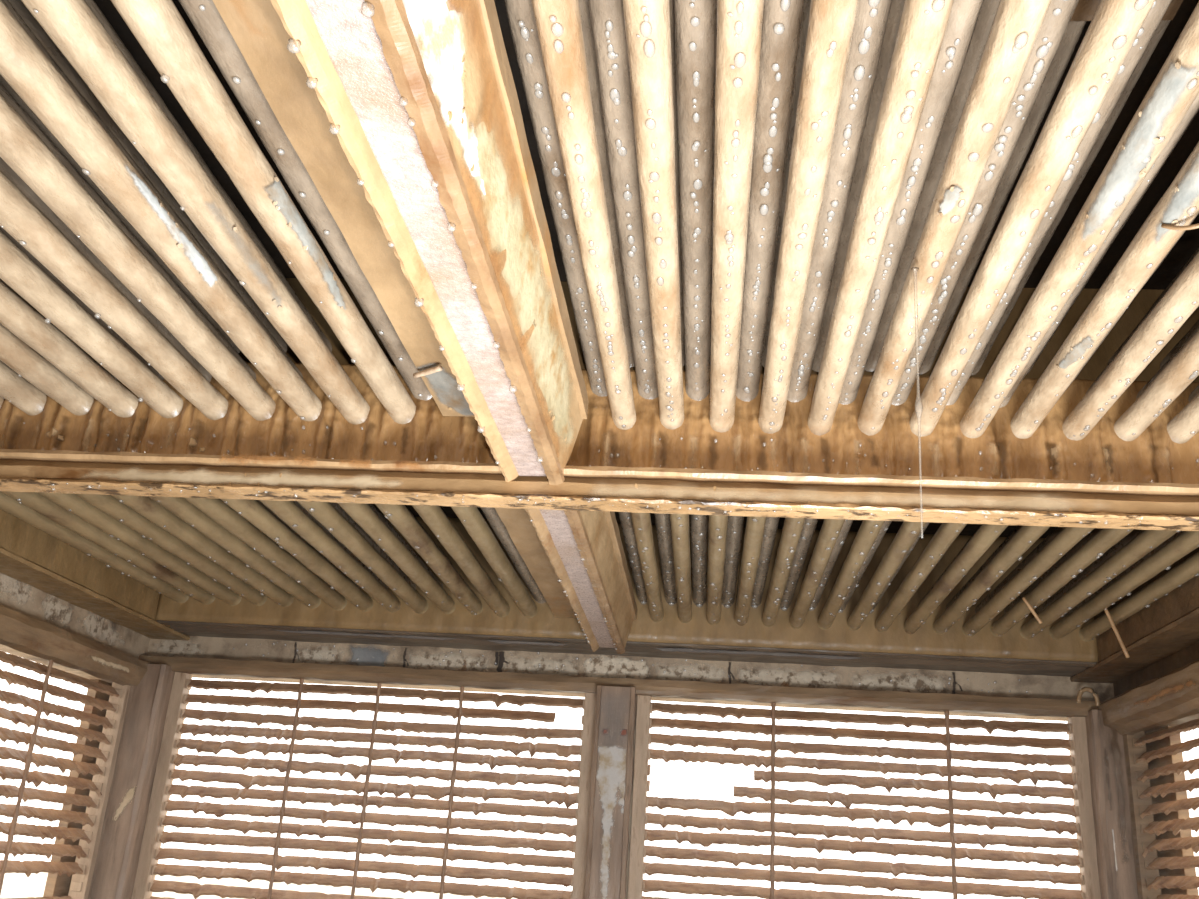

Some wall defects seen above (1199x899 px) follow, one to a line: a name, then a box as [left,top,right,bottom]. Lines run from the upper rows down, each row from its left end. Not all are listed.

peeling [127,167,217,287]
peeling [1083,62,1199,242]
peeling [596,747,626,899]